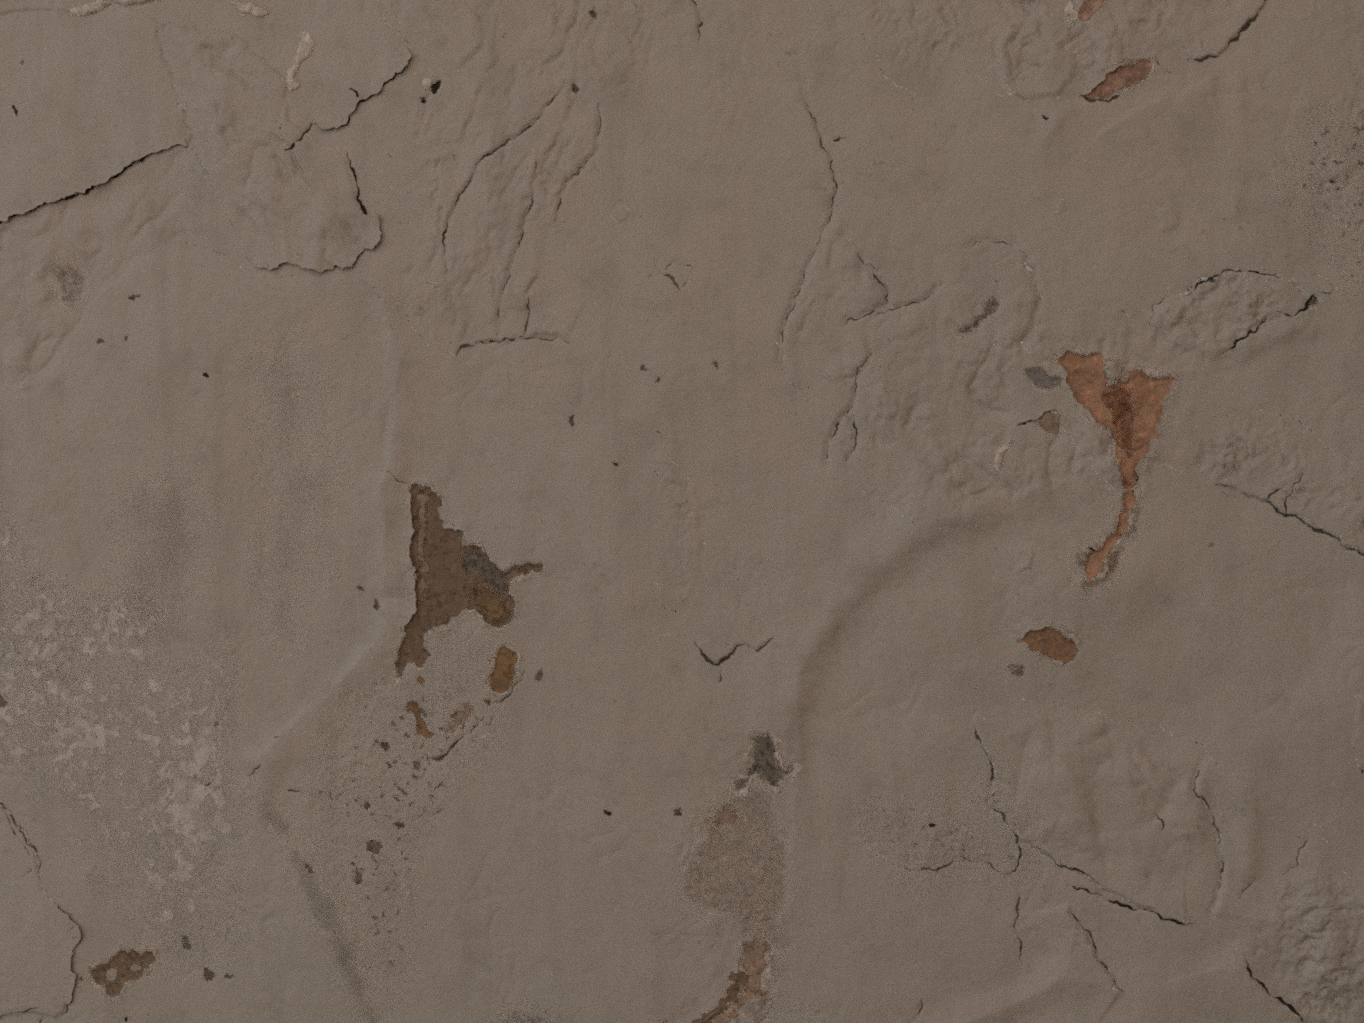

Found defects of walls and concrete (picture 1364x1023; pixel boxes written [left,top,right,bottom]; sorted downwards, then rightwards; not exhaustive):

peeling [0,0,214,390]
spalling [827,240,1364,583]
peeling [407,643,522,738]
peeling [392,481,546,685]
crack [694,638,772,682]
crack [1214,475,1364,555]
crack [0,803,41,876]
crack [0,998,73,1023]
peeling [0,805,158,1019]
peeling [647,730,803,1023]
crack [905,711,1308,992]
crack [1243,953,1303,1022]